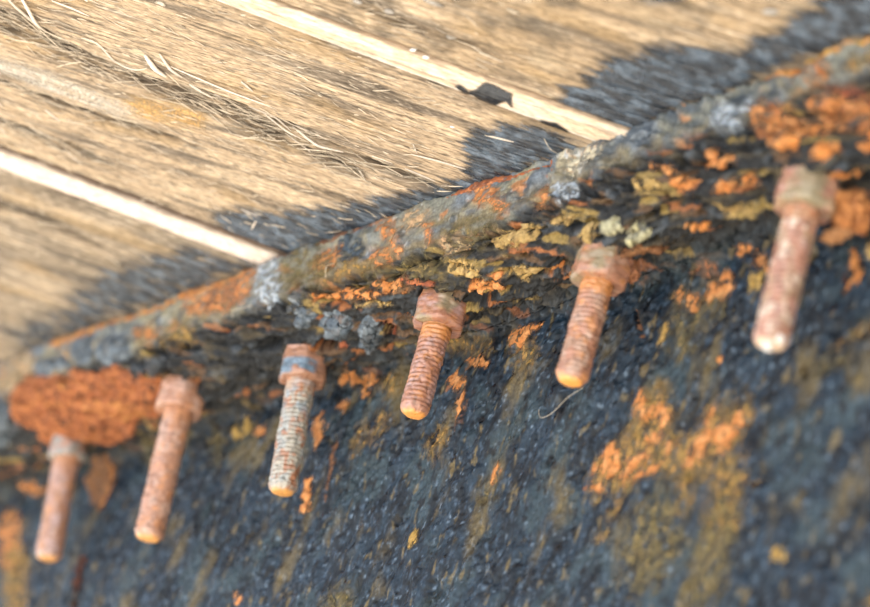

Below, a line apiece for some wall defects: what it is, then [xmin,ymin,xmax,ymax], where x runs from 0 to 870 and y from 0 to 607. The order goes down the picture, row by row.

corrosion [750,37,870,162]
corrosion [829,169,861,179]
corrosion [272,160,600,307]
corrosion [49,269,257,349]
corrosion [9,363,163,511]
corrosion [209,418,265,464]
corrosion [299,477,312,514]
corrosion [311,411,327,449]
corrosion [324,439,339,502]
corrosion [584,379,753,606]